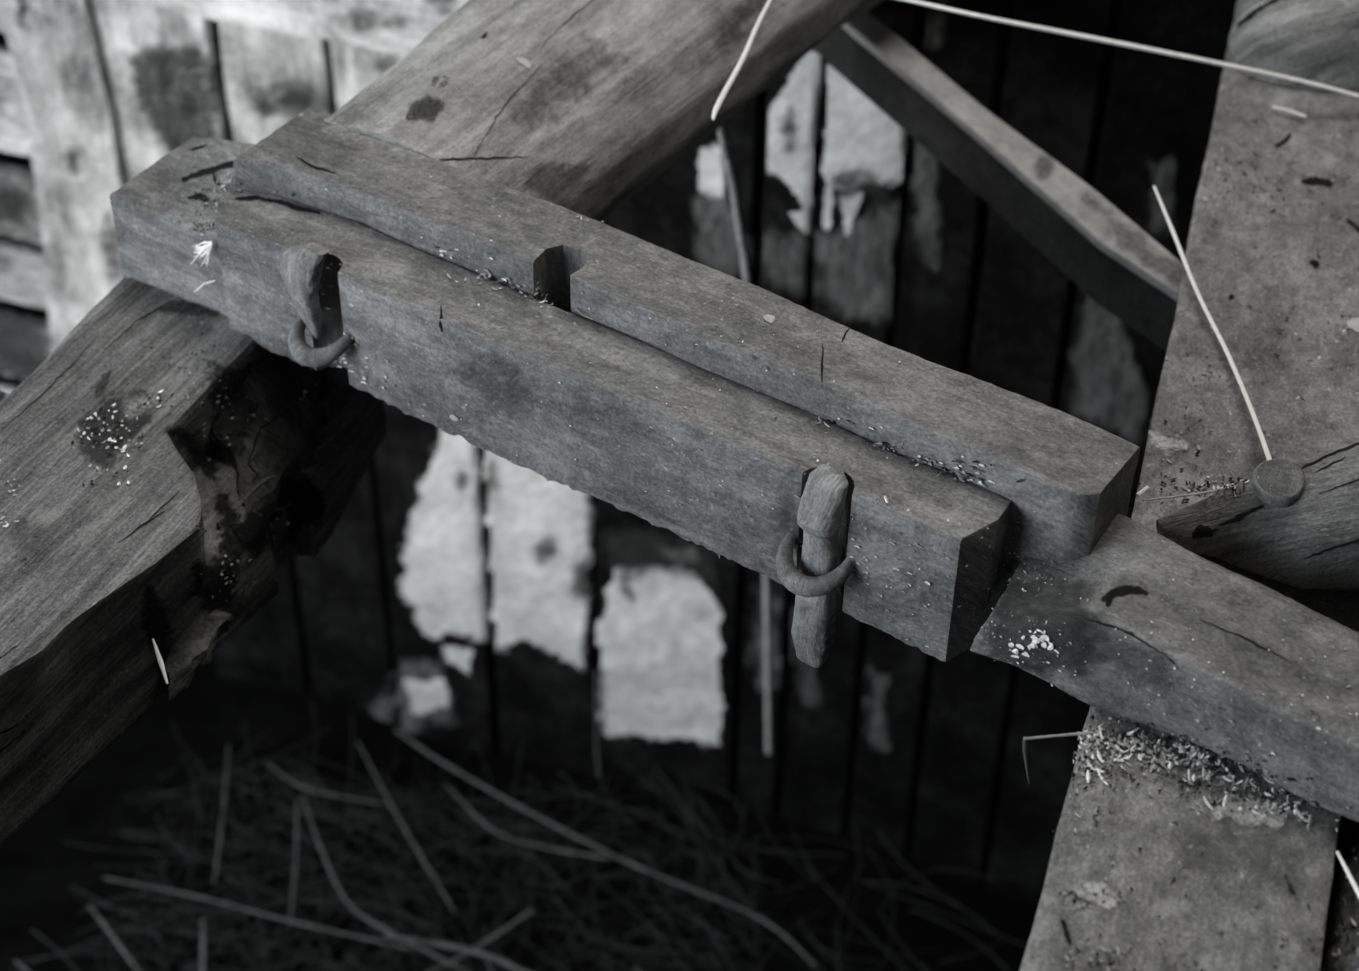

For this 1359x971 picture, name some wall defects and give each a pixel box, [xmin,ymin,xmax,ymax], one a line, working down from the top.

crack [439,0,593,161]
crack [1301,442,1359,494]